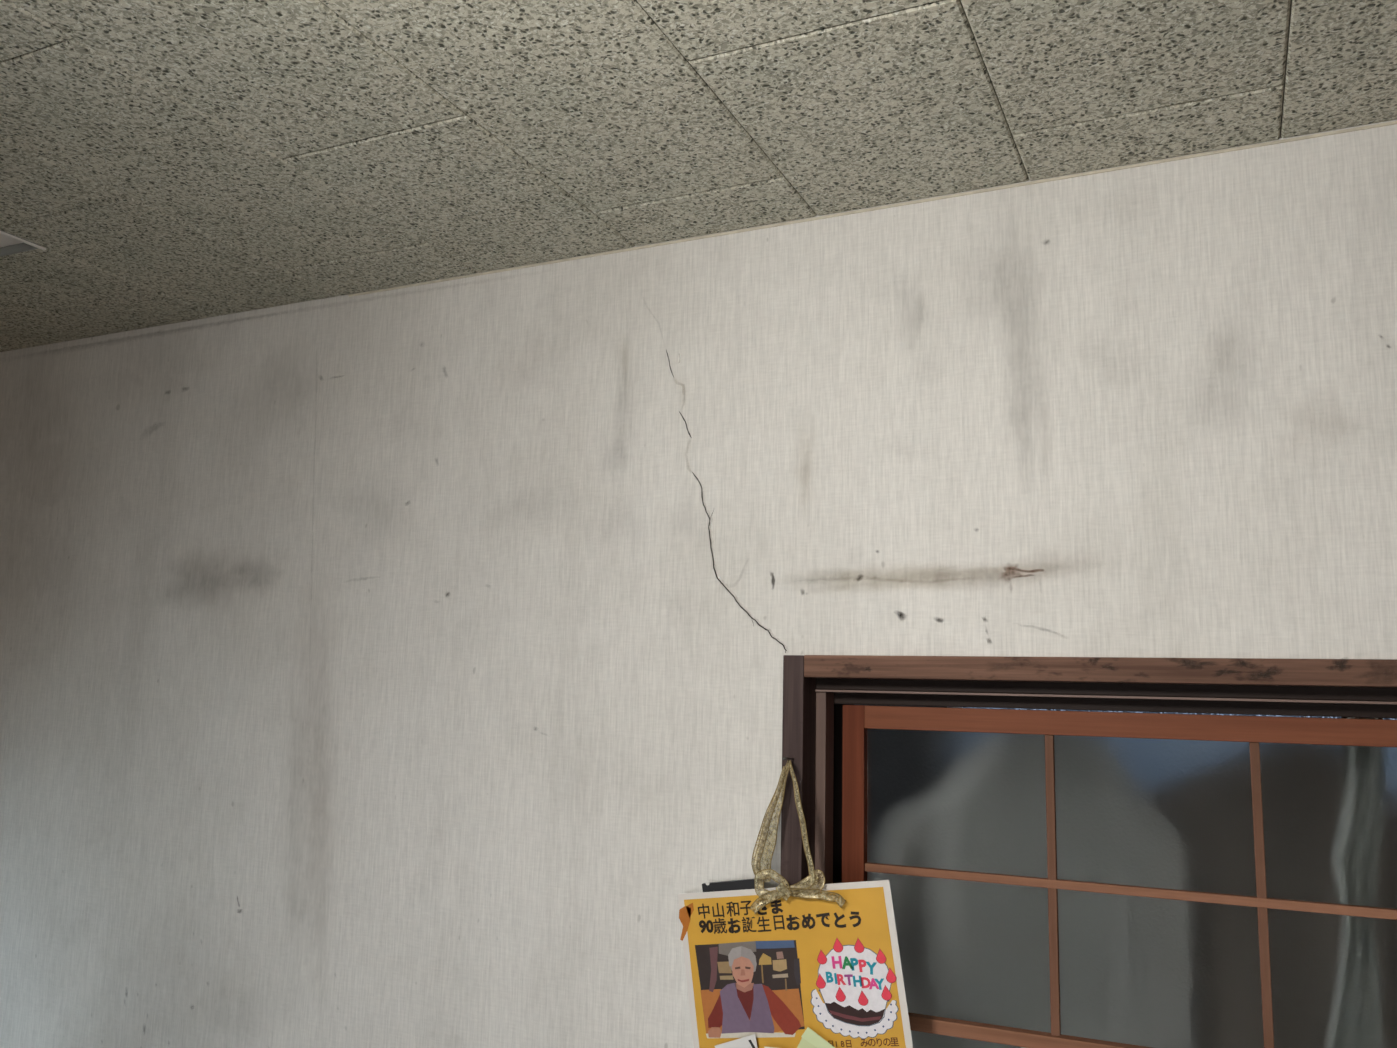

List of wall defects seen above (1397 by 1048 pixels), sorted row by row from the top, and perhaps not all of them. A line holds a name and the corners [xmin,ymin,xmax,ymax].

crack [692,472,787,653]